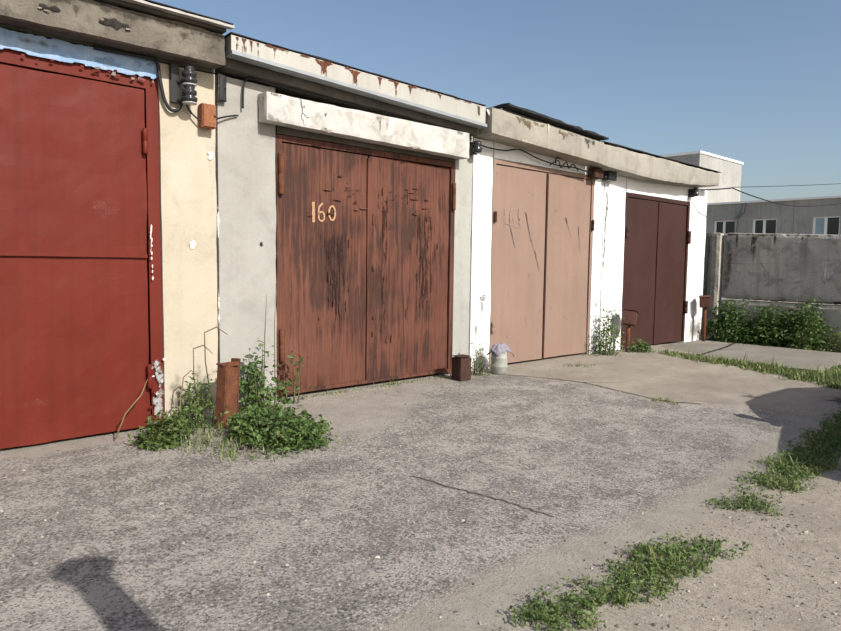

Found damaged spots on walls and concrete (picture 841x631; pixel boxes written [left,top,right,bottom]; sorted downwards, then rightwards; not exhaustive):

spalling [38,3,61,13]
spalling [99,18,131,30]
peeling [0,27,159,83]
corrosion [236,36,288,56]
corrosion [301,54,332,77]
water stain [725,233,776,288]
crack [413,476,554,517]